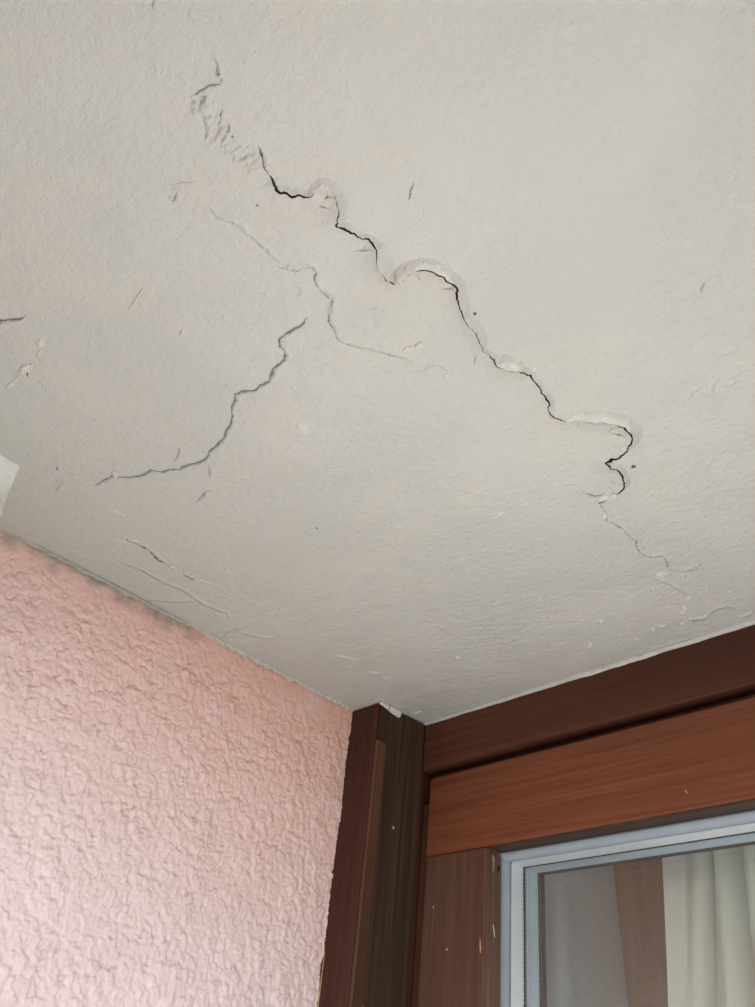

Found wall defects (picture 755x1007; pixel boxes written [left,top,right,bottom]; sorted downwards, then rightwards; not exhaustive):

crack [191,55,234,139]
crack [0,315,26,332]
crack [52,174,450,503]
crack [258,146,754,622]